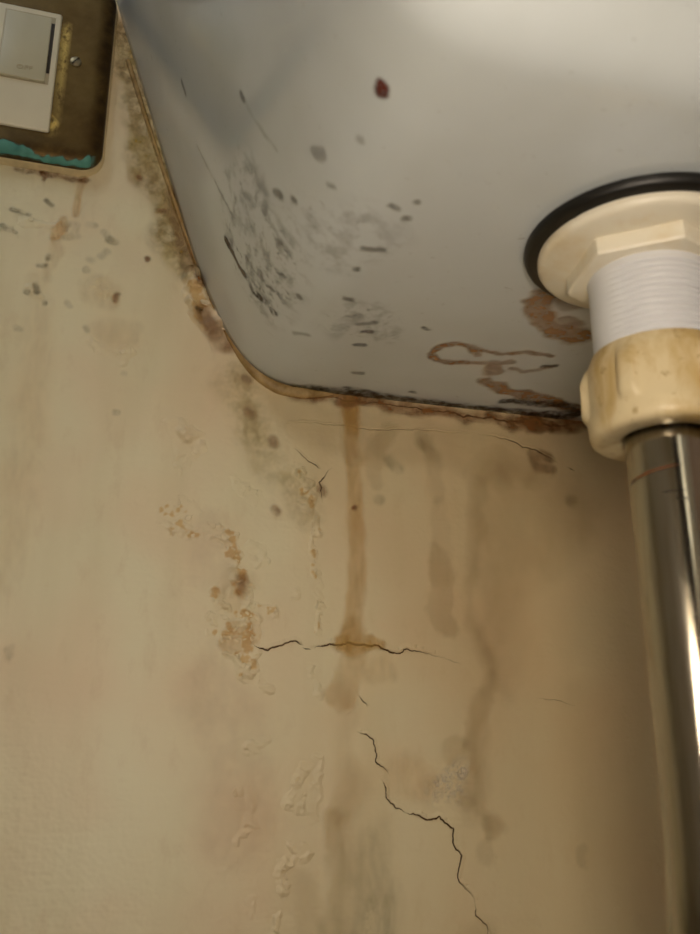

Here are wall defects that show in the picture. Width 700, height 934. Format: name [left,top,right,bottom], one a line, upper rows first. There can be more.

leakage [116,32,204,285]
corrosion [525,290,592,343]
corrosion [428,342,518,365]
corrosion [479,378,581,413]
peeling [204,527,281,685]
crack [255,636,450,658]
crack [358,728,491,934]